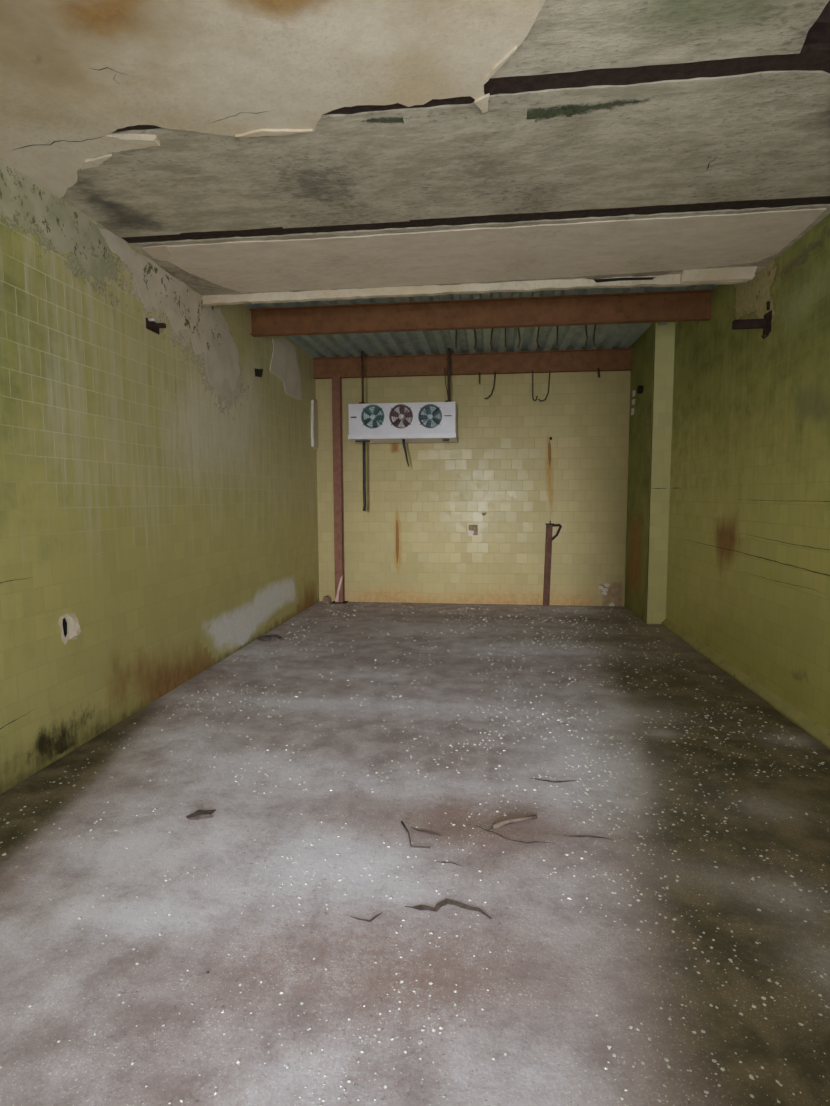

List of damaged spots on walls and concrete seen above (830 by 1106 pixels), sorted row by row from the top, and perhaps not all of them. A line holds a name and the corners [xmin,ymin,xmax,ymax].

peeling [0,0,826,414]
corrosion [267,492,605,632]
corrosion [624,497,648,616]
crack [683,533,830,593]
leakage [0,617,216,788]
crack [411,827,462,866]
crack [476,823,613,844]
crack [351,899,493,922]